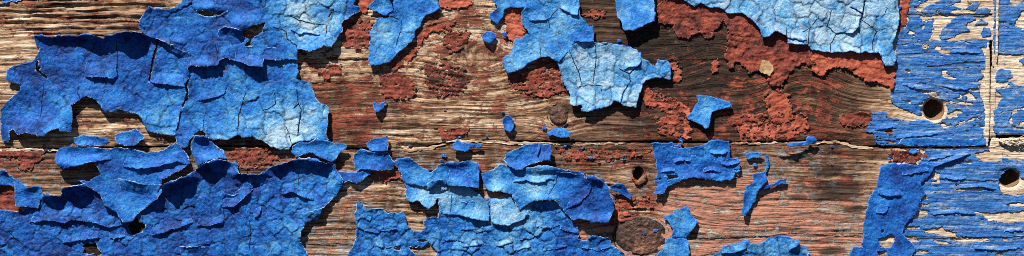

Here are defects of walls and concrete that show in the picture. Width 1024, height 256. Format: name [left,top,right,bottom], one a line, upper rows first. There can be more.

crack [149,39,159,81]
crack [200,9,378,142]
peeling [0,0,787,256]
crack [569,44,640,101]
peeling [684,0,1024,256]
crack [786,1,988,52]